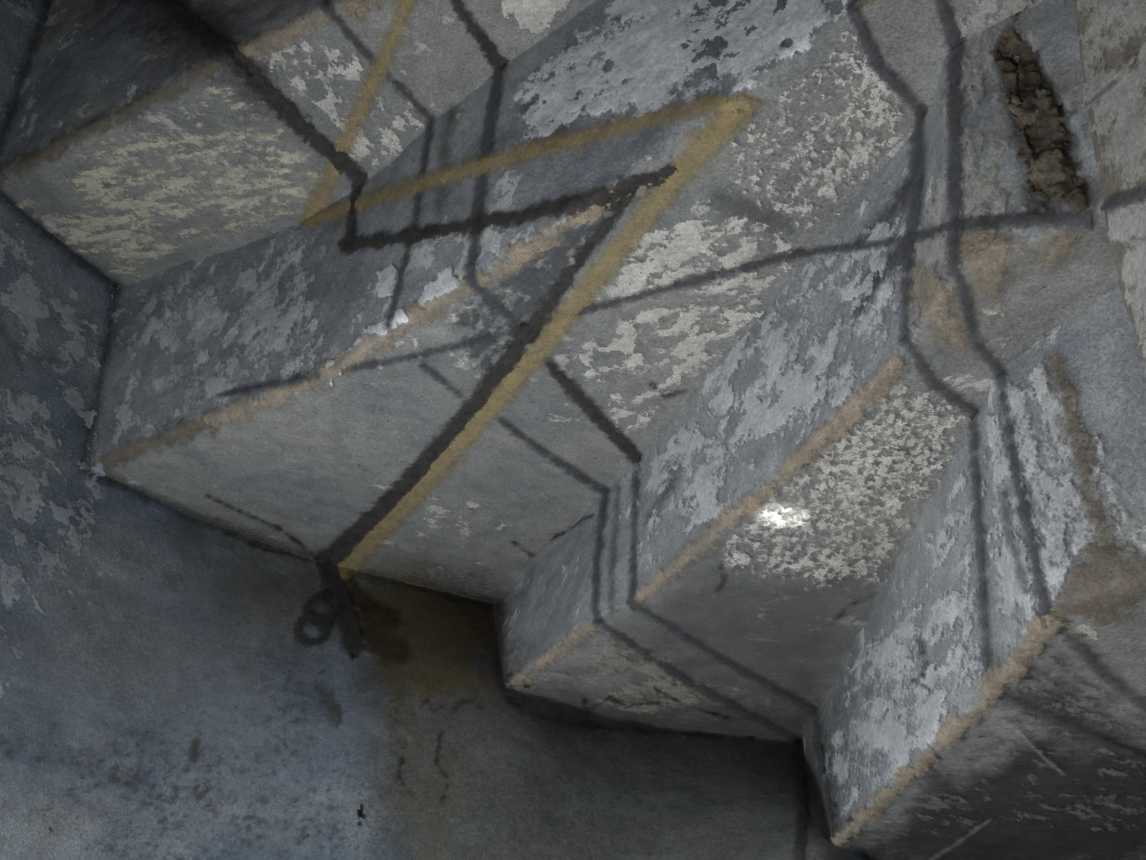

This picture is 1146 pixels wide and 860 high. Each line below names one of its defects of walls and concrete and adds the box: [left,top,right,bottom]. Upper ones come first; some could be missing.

water stain [359,567,504,710]
peeling [512,0,1146,848]